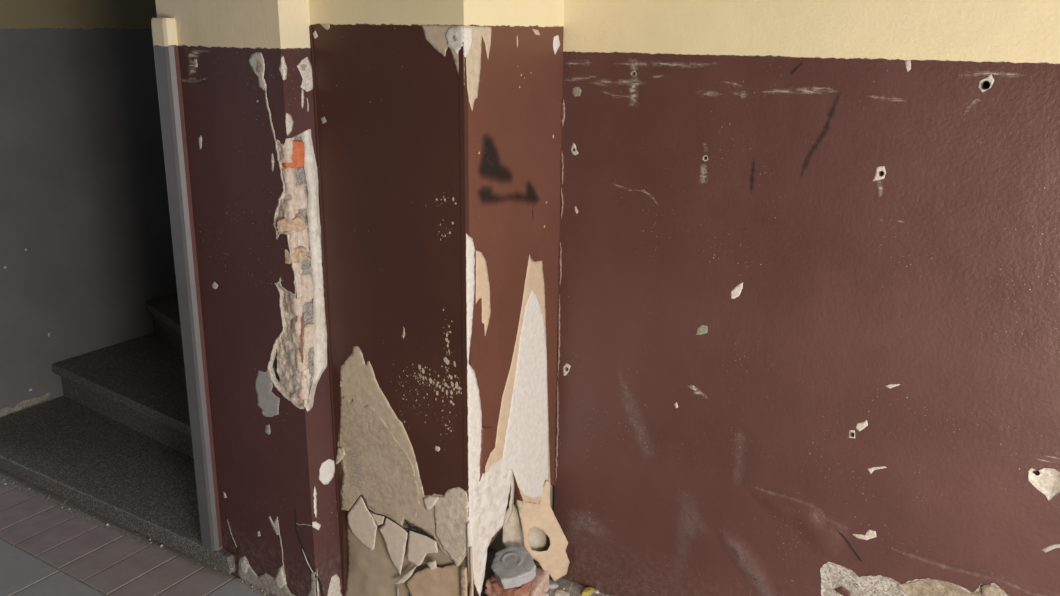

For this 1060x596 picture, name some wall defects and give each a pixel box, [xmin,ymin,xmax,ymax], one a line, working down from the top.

spalling [873,166,886,181]
flaking render [249,52,327,435]
peeling [555,243,570,482]
peeling [466,233,491,553]
flaking render [1028,456,1060,501]
peeling [347,496,438,575]
flaking render [238,556,295,596]
peeling [308,572,342,596]
flaking render [820,561,1010,596]